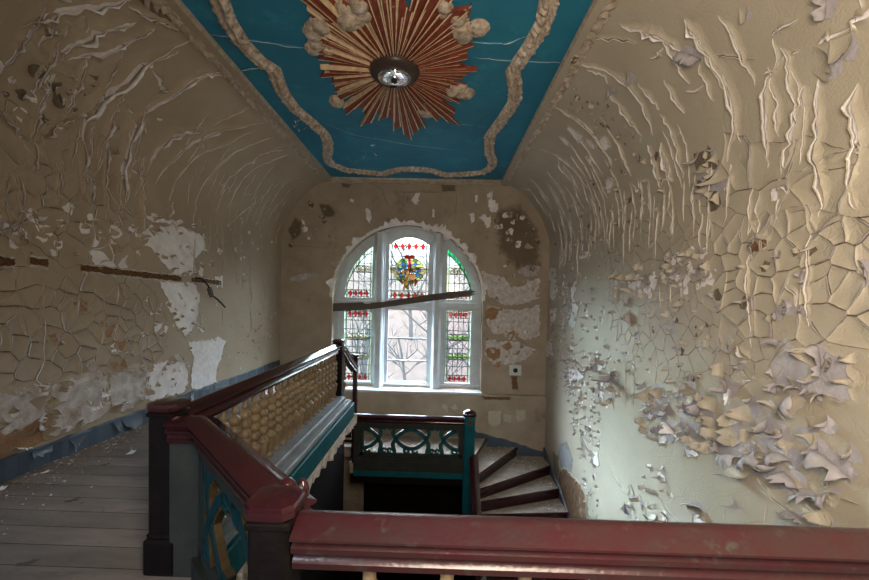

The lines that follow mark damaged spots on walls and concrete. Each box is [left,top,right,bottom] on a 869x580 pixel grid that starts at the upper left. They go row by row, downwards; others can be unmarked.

peeling [2,64,101,130]
crack [0,0,304,390]
peeling [467,190,540,251]
peeling [288,201,863,527]
crack [474,0,869,404]
flaking render [236,561,248,580]